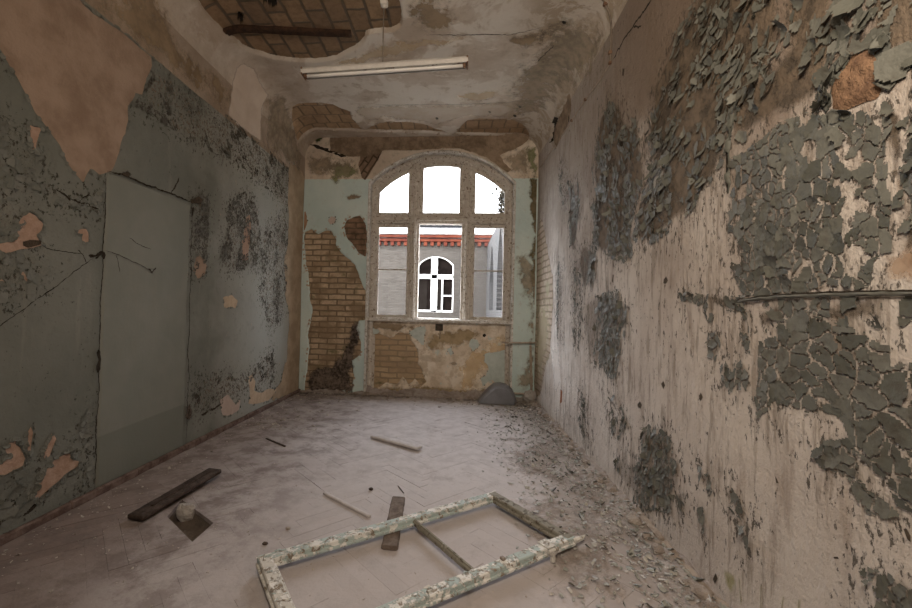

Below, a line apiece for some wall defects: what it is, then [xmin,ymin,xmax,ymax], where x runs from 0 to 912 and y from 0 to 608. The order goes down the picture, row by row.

spalling [199,0,401,58]
crack [613,0,651,59]
spalling [291,102,531,180]
peeling [0,0,367,418]
peeling [534,0,912,523]
crack [0,171,220,489]
spalling [373,326,426,388]
peeling [0,425,83,516]
peeling [859,566,912,608]